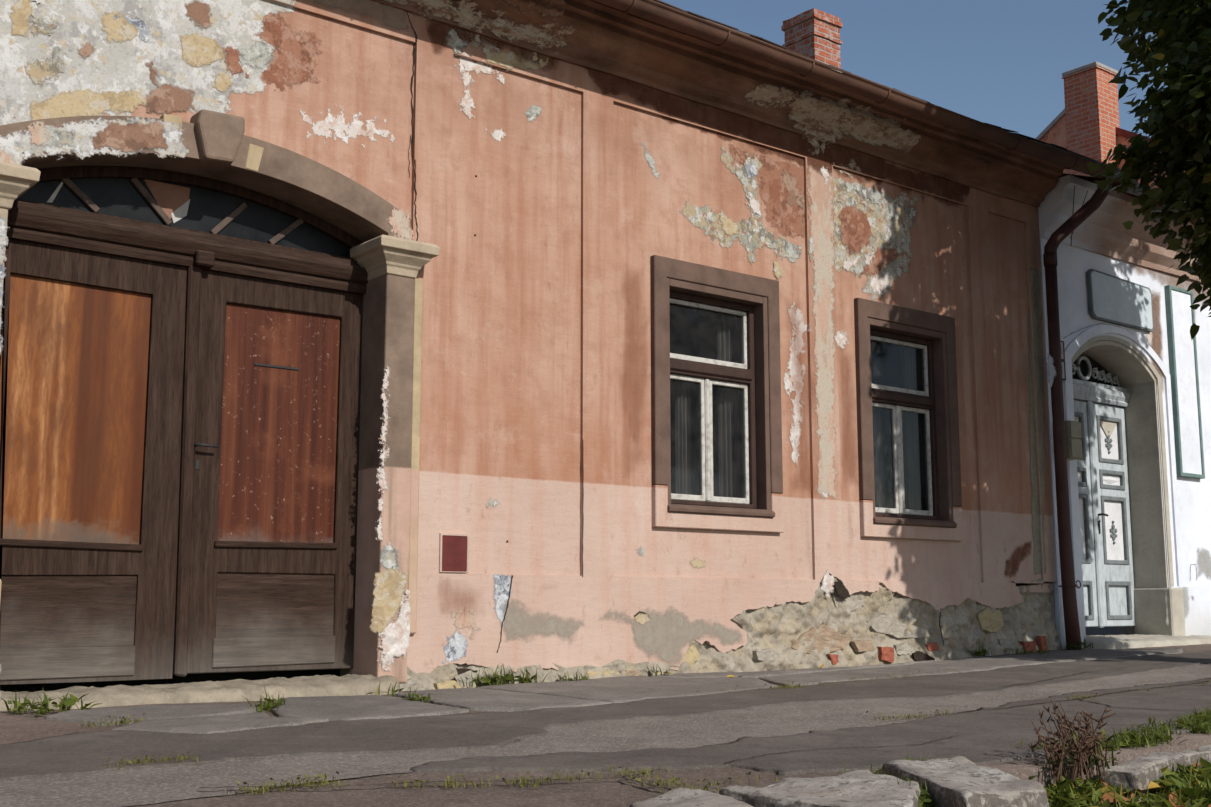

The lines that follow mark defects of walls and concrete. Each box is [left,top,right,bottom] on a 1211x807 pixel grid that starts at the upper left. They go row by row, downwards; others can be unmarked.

peeling [0,0,323,165]
peeling [300,103,395,150]
peeling [386,0,575,119]
peeling [485,128,506,141]
peeling [525,105,542,122]
peeling [0,217,10,352]
peeling [679,79,922,500]
spalling [370,367,1063,691]